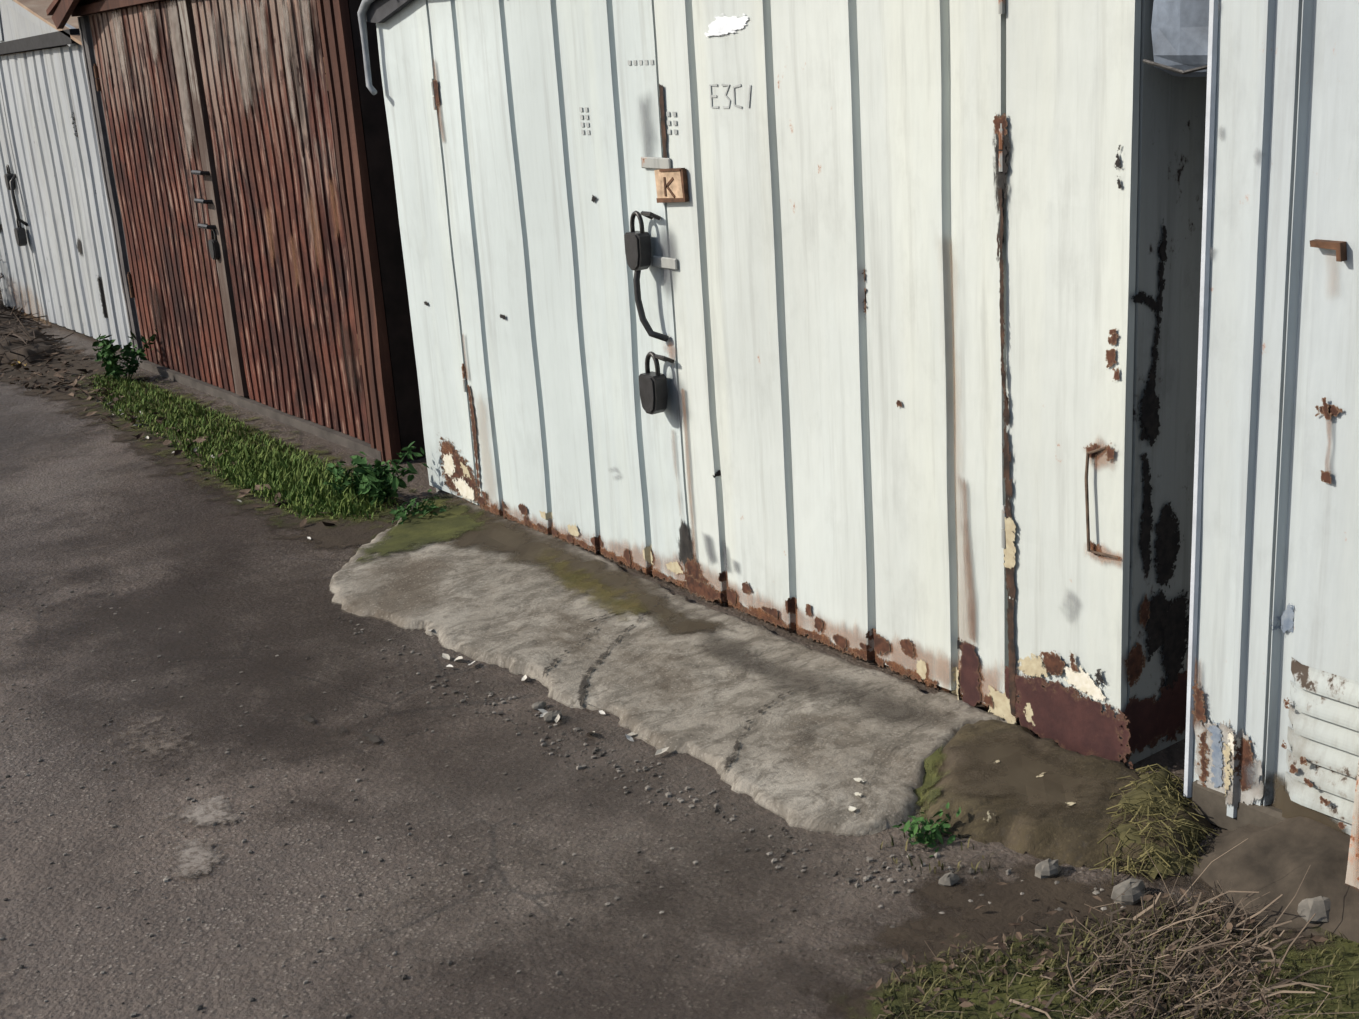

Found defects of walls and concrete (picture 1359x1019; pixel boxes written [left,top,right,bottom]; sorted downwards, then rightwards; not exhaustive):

corrosion [992,113,1016,716]
corrosion [1083,442,1115,464]
peeling [439,437,939,690]
corrosion [964,484,975,642]
crack [543,594,667,706]
crack [724,687,811,771]
corrosion [1265,775,1345,834]